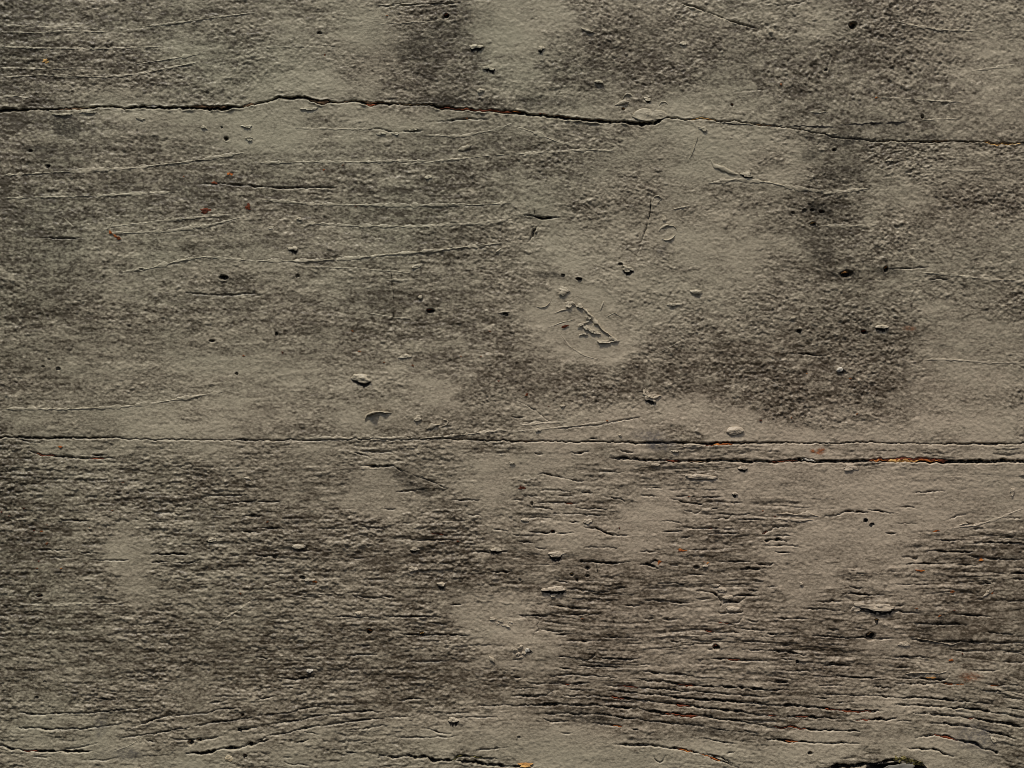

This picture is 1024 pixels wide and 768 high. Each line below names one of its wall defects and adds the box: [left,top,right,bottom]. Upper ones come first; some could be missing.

crack [0,96,1024,146]
peeling [536,286,620,343]
crack [0,400,1024,768]